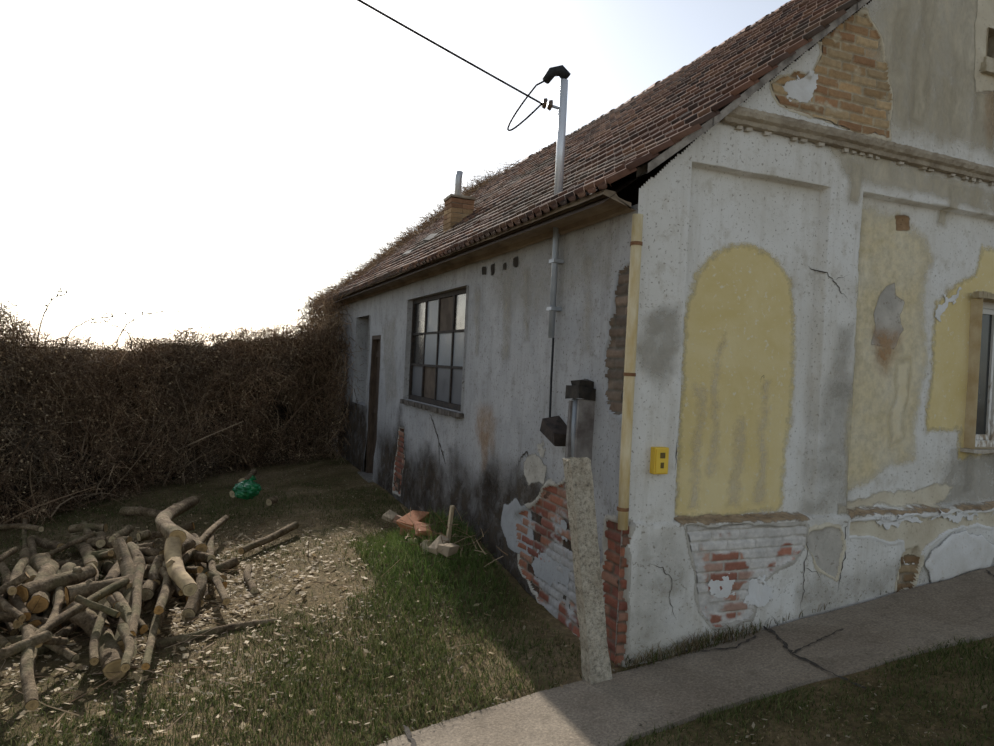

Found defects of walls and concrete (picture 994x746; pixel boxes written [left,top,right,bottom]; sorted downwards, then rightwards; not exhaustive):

flaking render [770,7,893,141]
spalling [602,260,630,423]
spalling [871,283,905,363]
flaking render [392,426,405,497]
spalling [382,510,422,543]
water stain [377,437,574,612]
flaking render [516,440,580,640]
flaking render [600,514,636,668]
flaking render [674,501,994,630]